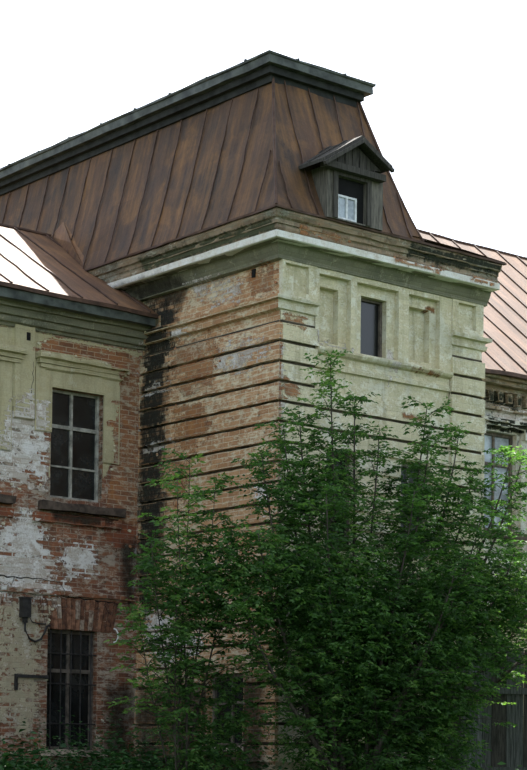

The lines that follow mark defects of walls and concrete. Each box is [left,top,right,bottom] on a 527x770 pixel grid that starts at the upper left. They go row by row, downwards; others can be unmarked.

spalling [247,261,278,296]
water stain [120,270,243,625]
spalling [166,329,229,507]
water stain [212,334,286,386]
spalling [279,311,308,438]
peeling [492,403,527,434]
crack [0,574,134,612]
flaking render [0,337,142,742]